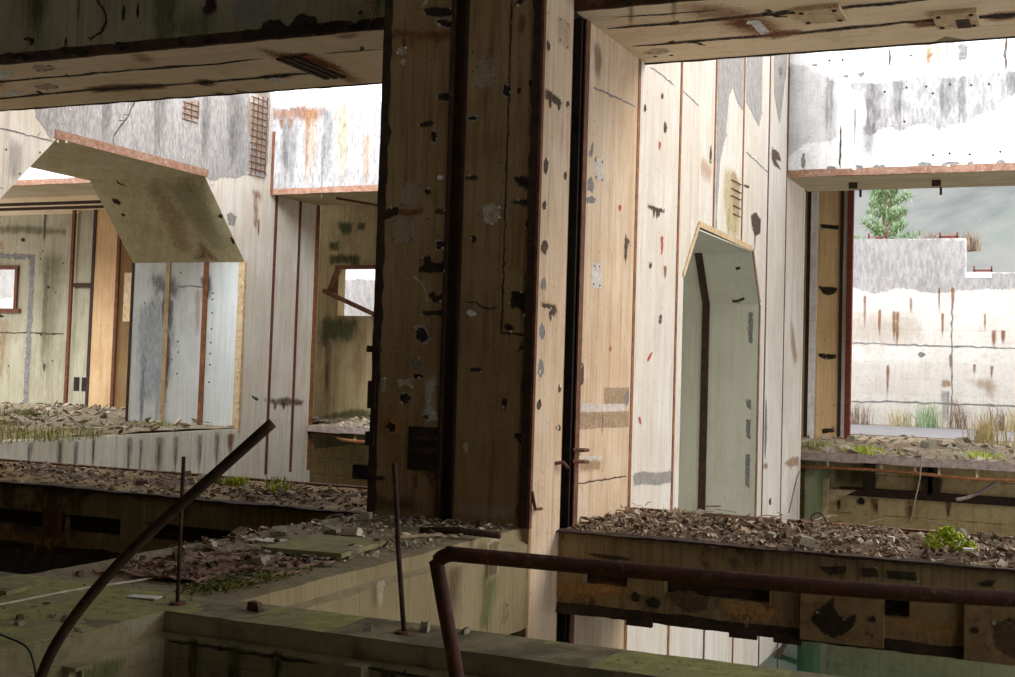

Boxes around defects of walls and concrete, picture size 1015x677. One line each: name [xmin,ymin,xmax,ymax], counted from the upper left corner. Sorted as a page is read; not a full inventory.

rust [259,49,364,83]
spalling [945,42,970,63]
peeling [36,79,381,189]
rust [280,108,314,127]
peeling [843,71,1015,135]
spalling [811,597,856,638]
spalling [992,617,1015,659]